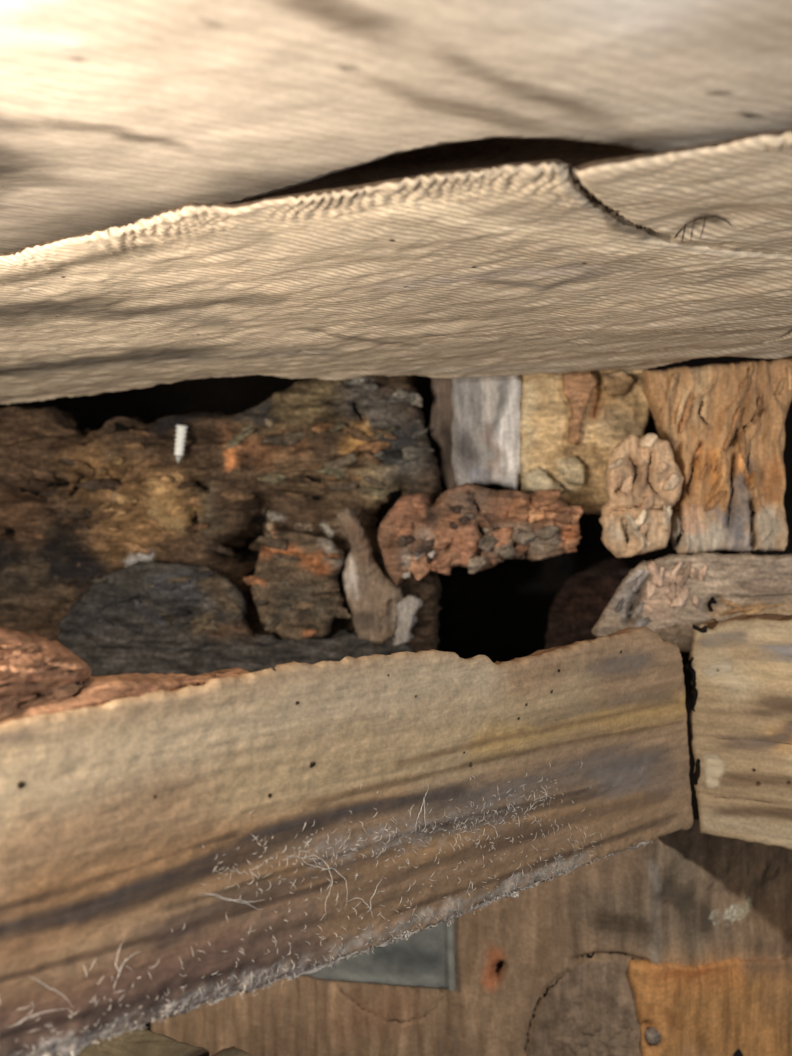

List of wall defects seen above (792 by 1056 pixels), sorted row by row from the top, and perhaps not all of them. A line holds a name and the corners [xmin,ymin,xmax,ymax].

crack [569,166,735,241]
water stain [0,777,547,935]
water stain [490,851,583,897]
water stain [123,886,291,945]
water stain [1,953,95,979]
water stain [32,961,302,1056]
crack [527,952,645,1044]